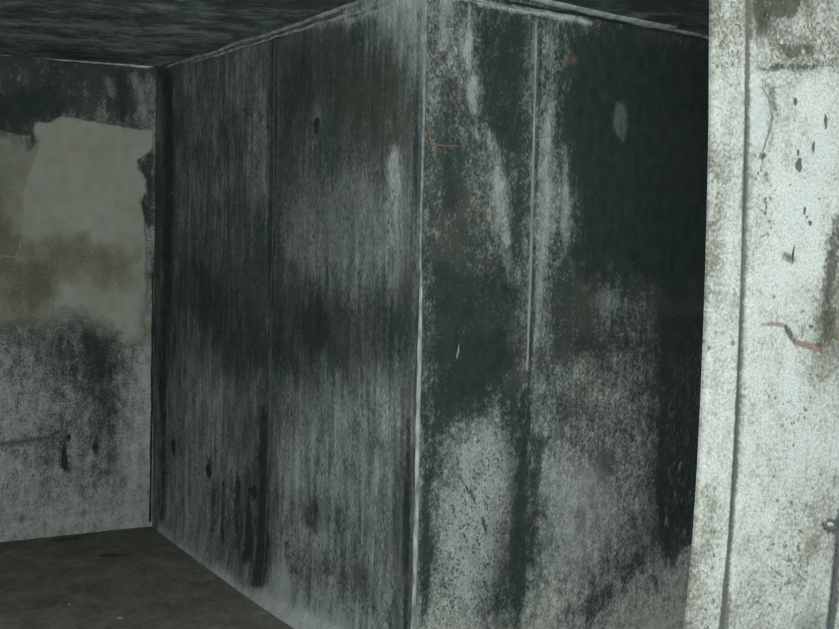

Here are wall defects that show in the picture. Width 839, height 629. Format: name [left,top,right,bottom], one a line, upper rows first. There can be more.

damp [138,153,154,226]
damp [159,70,176,434]
damp [209,407,343,629]
damp [196,64,402,364]
damp [284,419,411,629]
damp [420,263,522,613]
damp [461,8,527,247]
damp [490,387,544,627]
damp [534,0,742,343]
damp [753,0,813,34]
rust [767,323,823,351]